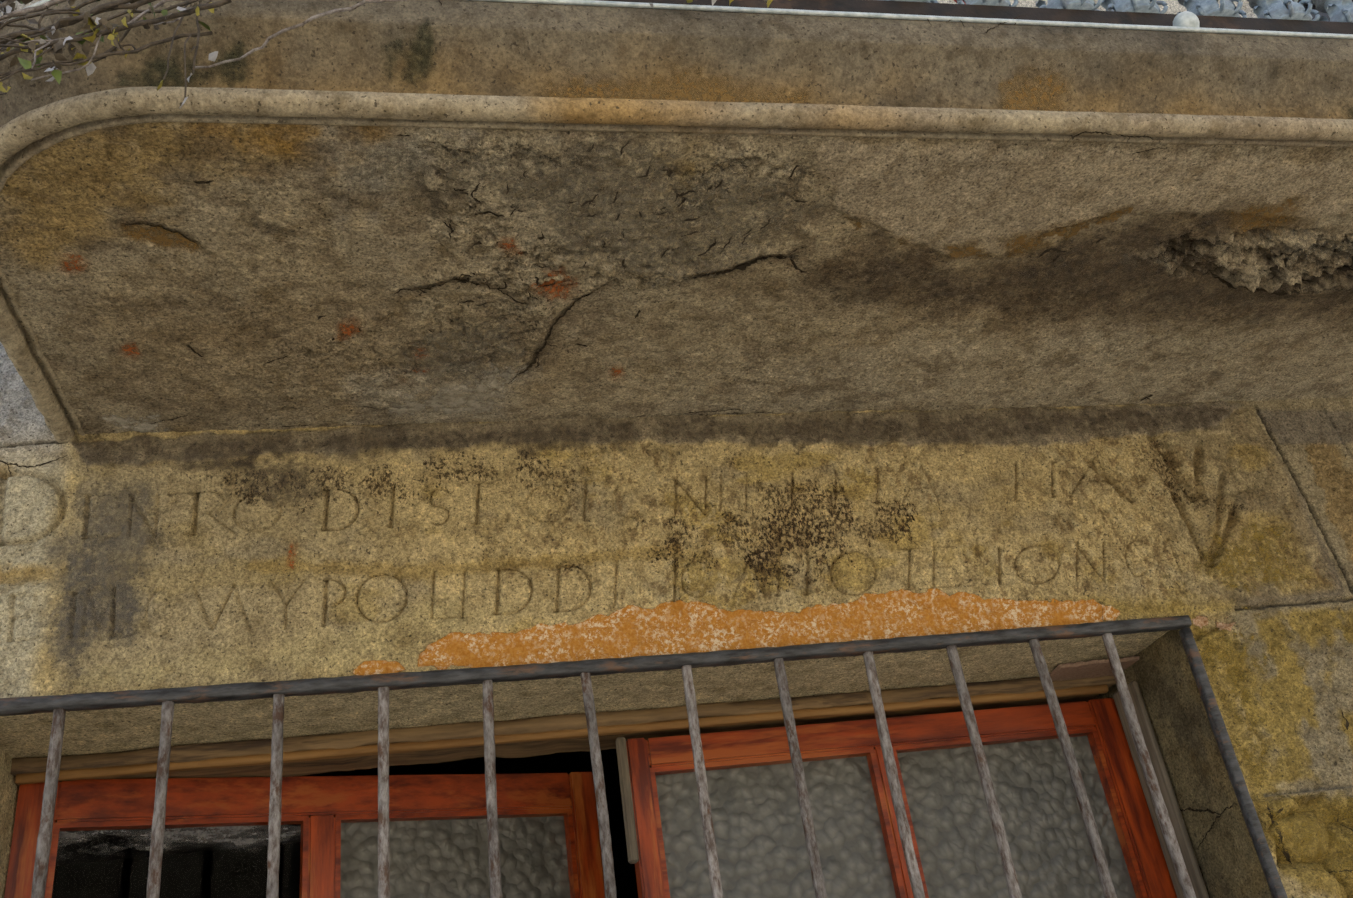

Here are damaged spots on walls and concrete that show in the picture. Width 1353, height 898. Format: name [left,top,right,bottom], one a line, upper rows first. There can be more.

crack [394,141,809,384]
water stain [992,206,1353,320]
water stain [647,525,694,567]
water stain [744,509,830,588]
water stain [896,508,916,543]